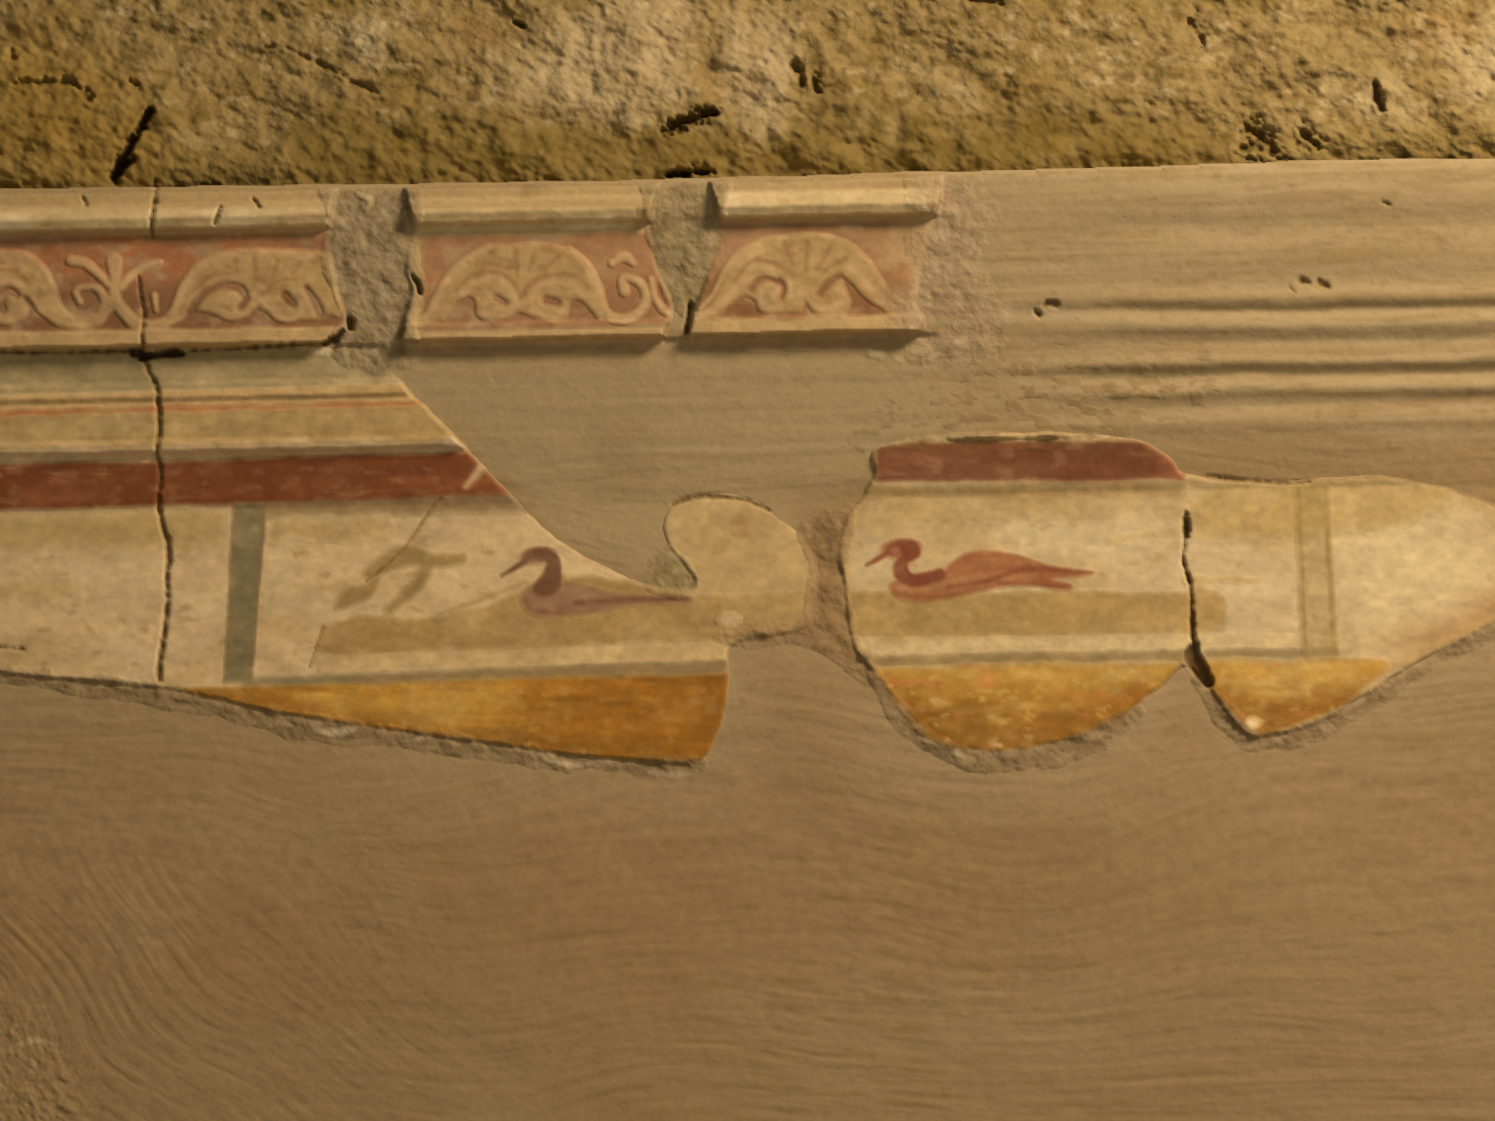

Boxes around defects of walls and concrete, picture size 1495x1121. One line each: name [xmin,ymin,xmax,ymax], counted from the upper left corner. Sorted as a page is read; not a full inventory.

crack [147,177,159,240]
spalling [409,273,423,296]
crack [186,340,329,353]
spalling [307,314,355,358]
crack [0,276,174,683]
crack [1206,474,1312,487]
crack [364,496,443,584]
crack [1180,511,1215,689]
crack [308,624,326,669]